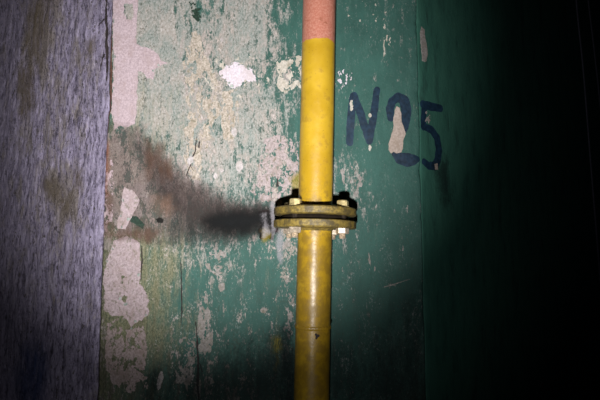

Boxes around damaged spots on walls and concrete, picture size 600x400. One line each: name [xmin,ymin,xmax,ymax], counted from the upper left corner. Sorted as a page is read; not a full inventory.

peeling [111,0,167,130]
peeling [182,26,269,184]
peeling [276,55,302,93]
peeling [388,106,406,153]
spalling [420,27,428,62]
peeling [250,135,299,202]
peeling [103,160,149,393]
peeling [205,248,230,275]
peeling [283,268,295,338]
peeling [171,295,213,400]